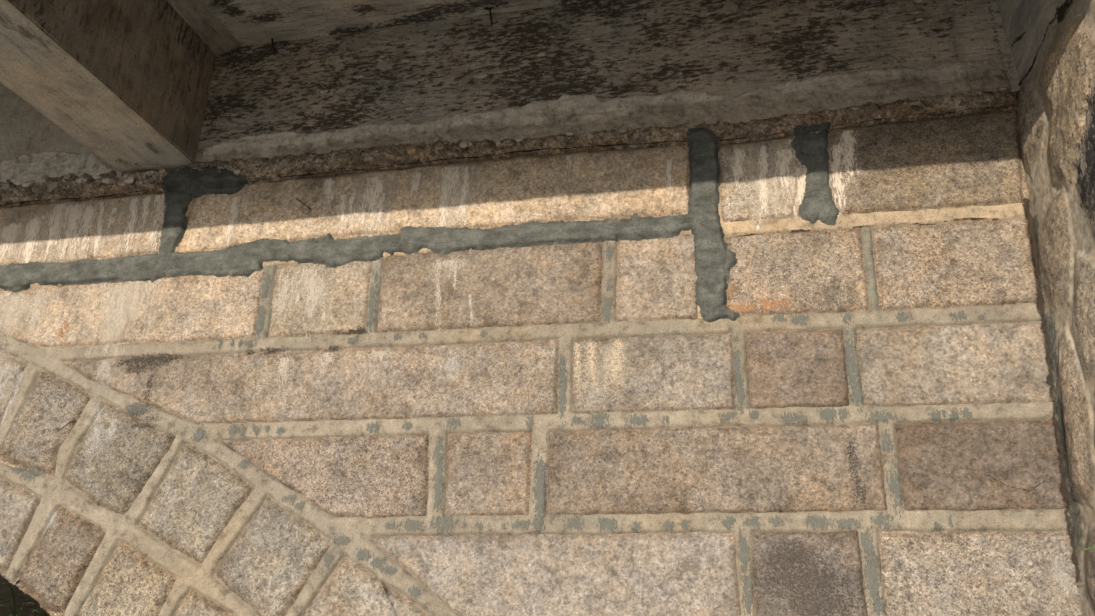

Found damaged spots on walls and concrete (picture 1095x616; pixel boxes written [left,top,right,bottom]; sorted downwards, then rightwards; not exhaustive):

water stain [211,0,283,24]
water stain [317,0,520,37]
crack [835,0,1072,126]
water stain [0,194,165,265]
water stain [316,166,486,236]
water stain [719,142,807,240]